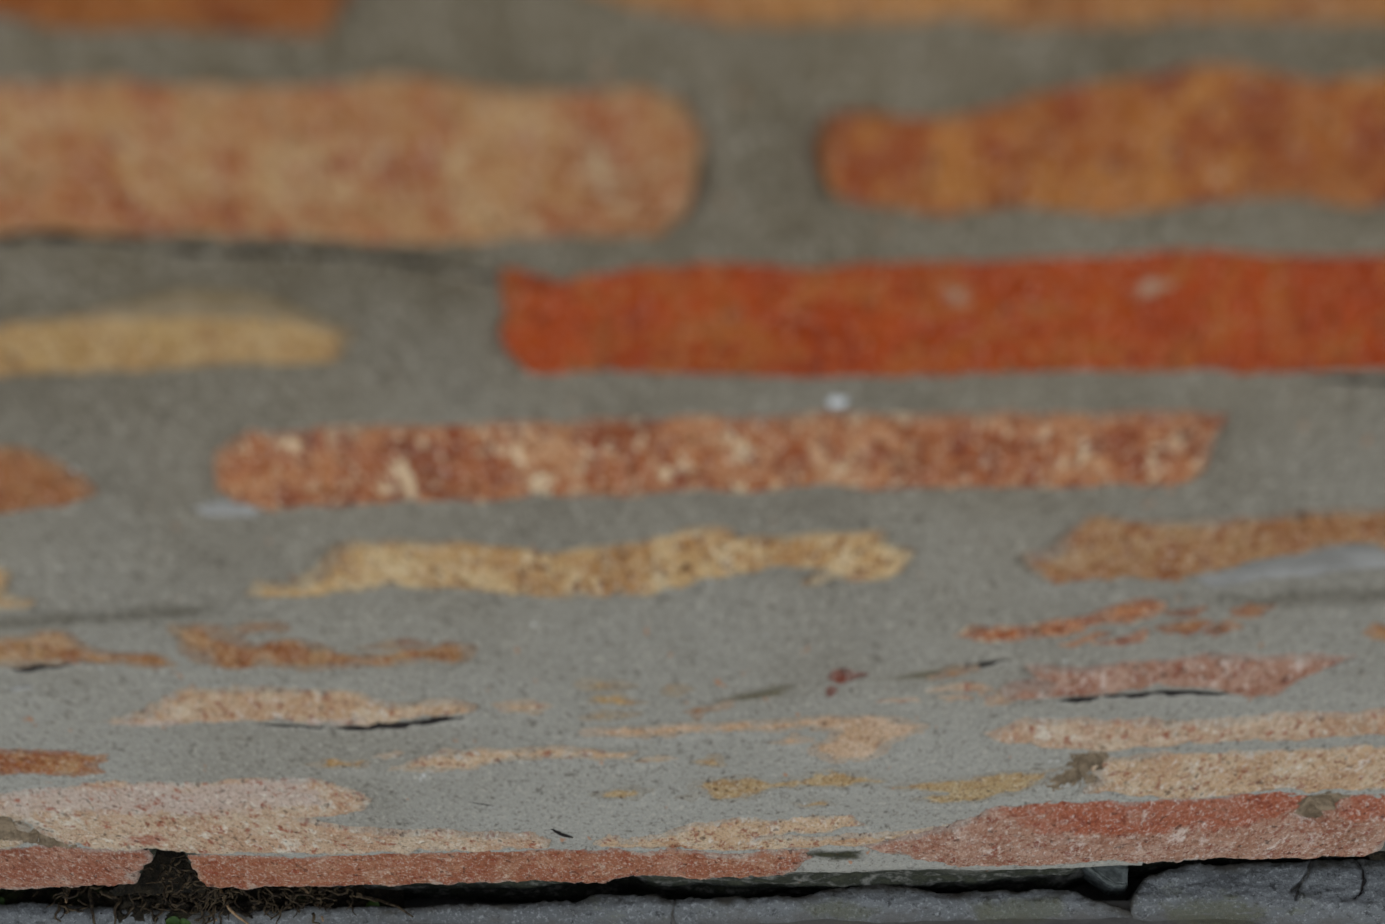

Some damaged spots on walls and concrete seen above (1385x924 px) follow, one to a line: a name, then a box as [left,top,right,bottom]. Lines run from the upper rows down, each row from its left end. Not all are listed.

crack [1291,861,1312,897]
crack [1354,864,1367,899]